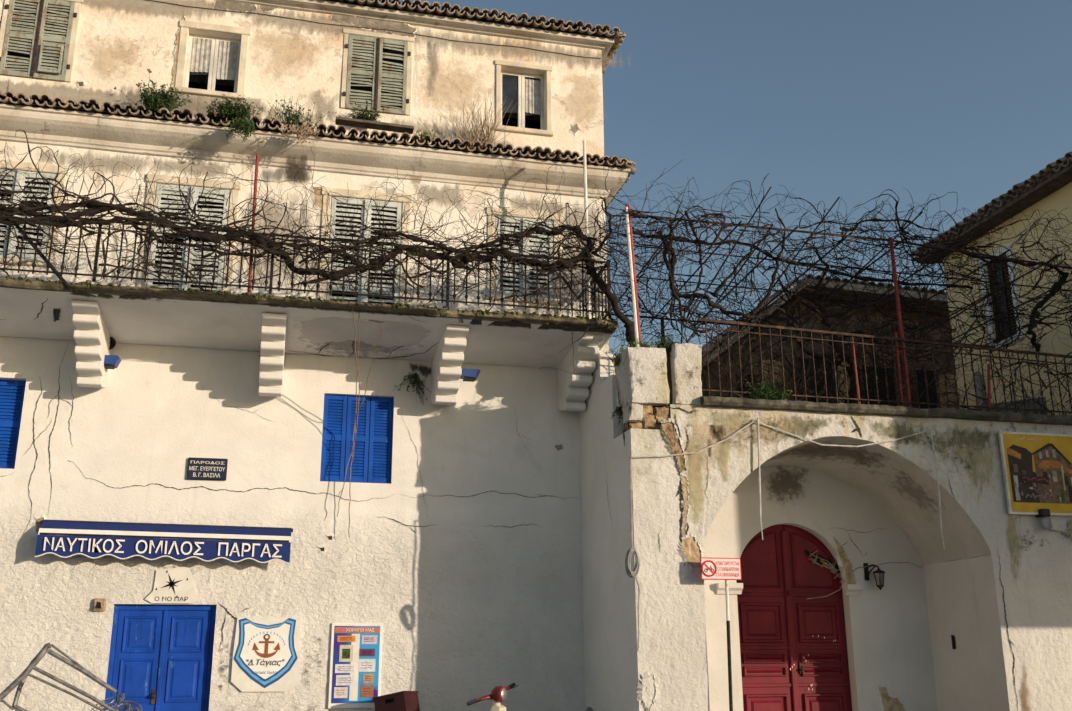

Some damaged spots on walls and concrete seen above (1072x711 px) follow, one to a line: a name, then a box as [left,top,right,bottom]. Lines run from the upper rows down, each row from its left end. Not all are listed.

damp [285,155,312,182]
flaking render [300,316,430,348]
crack [0,348,581,534]
spalling [624,354,705,574]
flaking render [877,683,908,711]
crack [997,551,1018,711]